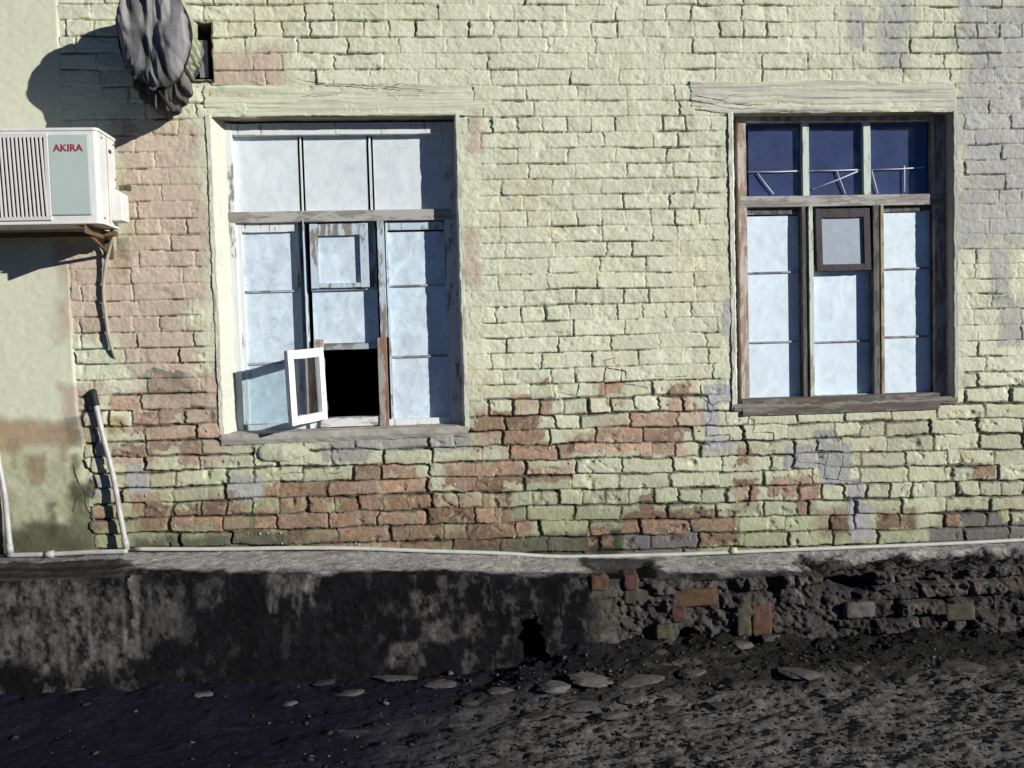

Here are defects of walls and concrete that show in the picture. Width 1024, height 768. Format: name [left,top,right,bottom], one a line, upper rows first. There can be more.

peeling [108,387,220,467]
water stain [0,478,183,674]
peeling [92,508,112,530]
water stain [127,463,148,496]
water stain [227,475,263,502]
water stain [268,574,314,612]
peeling [131,380,703,550]
water stain [388,593,478,667]
spalling [581,448,1024,644]